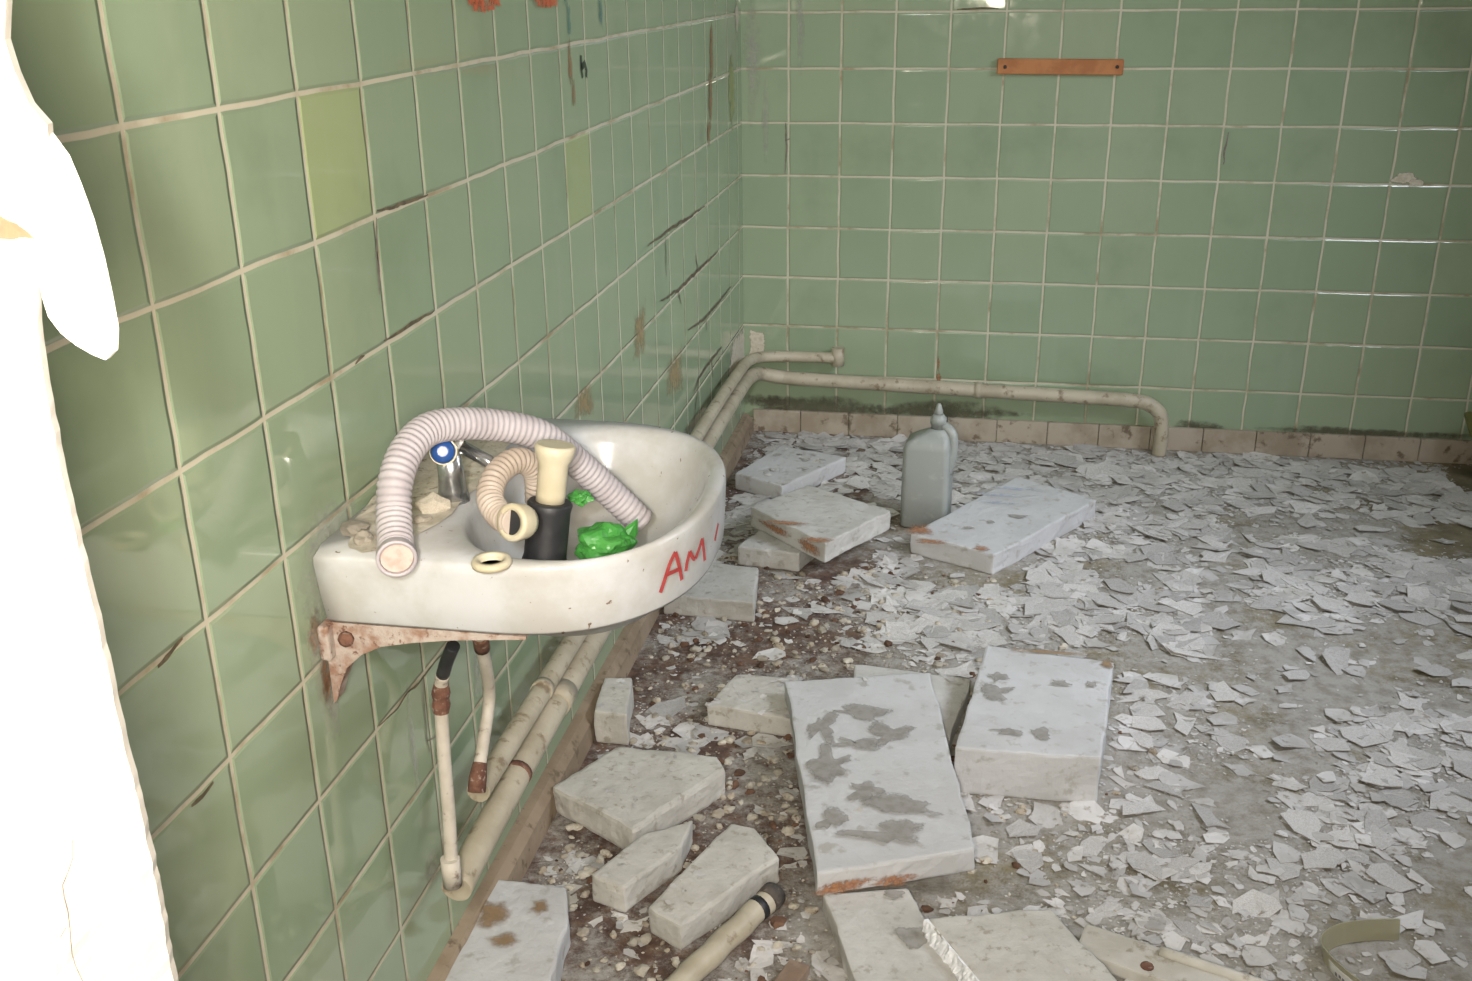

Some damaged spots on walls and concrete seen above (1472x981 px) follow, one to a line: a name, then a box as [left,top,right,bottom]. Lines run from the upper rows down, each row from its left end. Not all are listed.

crack [355,311,434,365]
rust [310,616,332,701]
rust [472,640,490,656]
spalling [922,919,979,981]